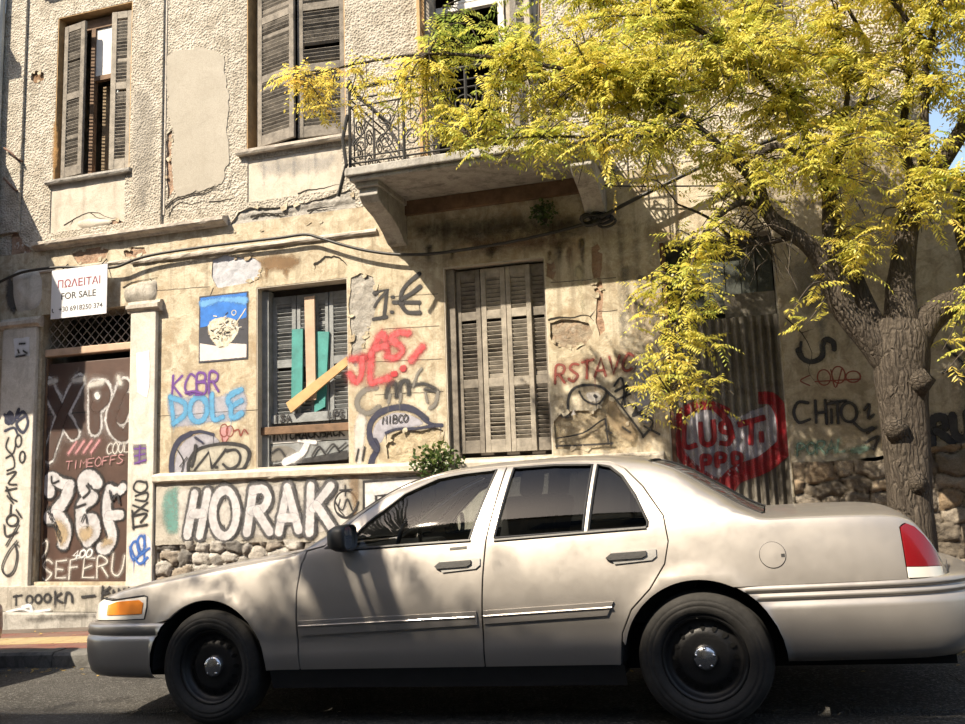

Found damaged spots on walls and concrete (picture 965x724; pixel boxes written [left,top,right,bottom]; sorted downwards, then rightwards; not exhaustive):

flaking render [165,132,173,199]
crack [165,170,234,217]
crack [250,184,339,218]
flaking render [73,247,109,264]
flaking render [124,247,146,258]
peeling [347,273,379,367]
flaking render [550,244,605,350]